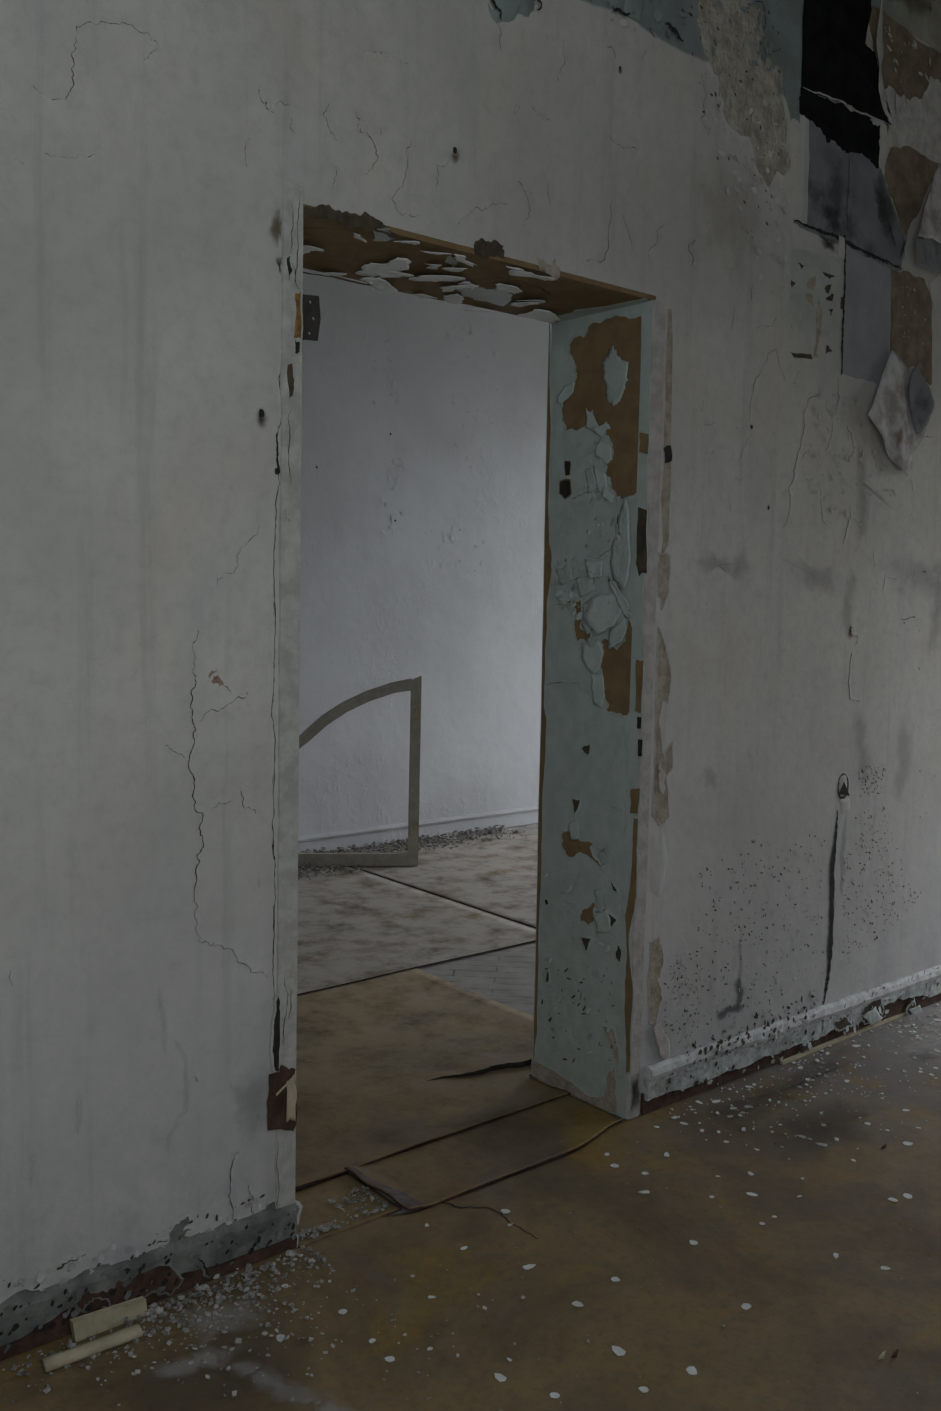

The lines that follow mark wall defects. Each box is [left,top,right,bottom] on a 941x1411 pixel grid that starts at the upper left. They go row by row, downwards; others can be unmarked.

flaking render [694,0,803,193]
peeling [286,245,324,338]
peeling [303,204,941,1114]
peeling [0,1189,303,1354]